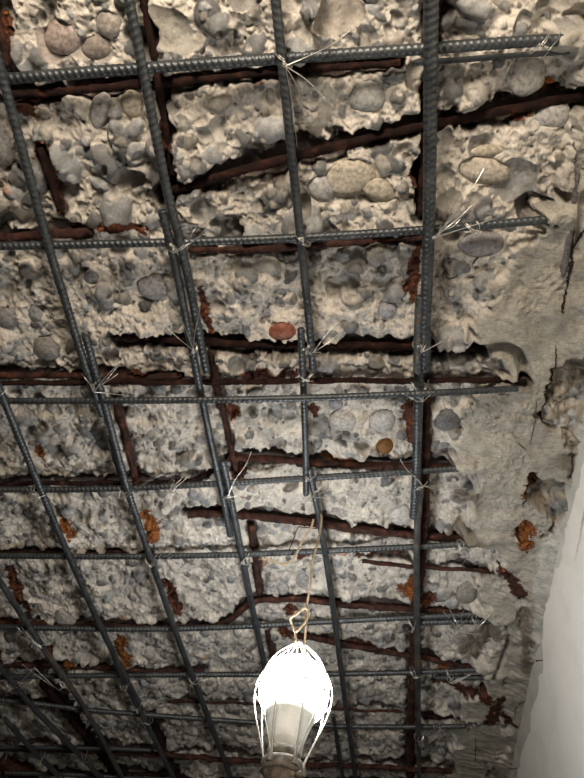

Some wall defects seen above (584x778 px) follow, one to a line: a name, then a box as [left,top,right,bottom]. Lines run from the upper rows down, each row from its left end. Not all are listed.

spalling [0,0,423,73]
spalling [10,75,174,241]
spalling [149,65,295,238]
spalling [288,55,423,234]
corrosion [188,235,422,303]
spalling [424,102,584,537]
crack [561,229,584,315]
spalling [0,236,510,778]
corrosion [0,286,528,778]
corrosion [512,520,538,554]
corrosion [520,472,538,500]
peeling [482,358,584,778]